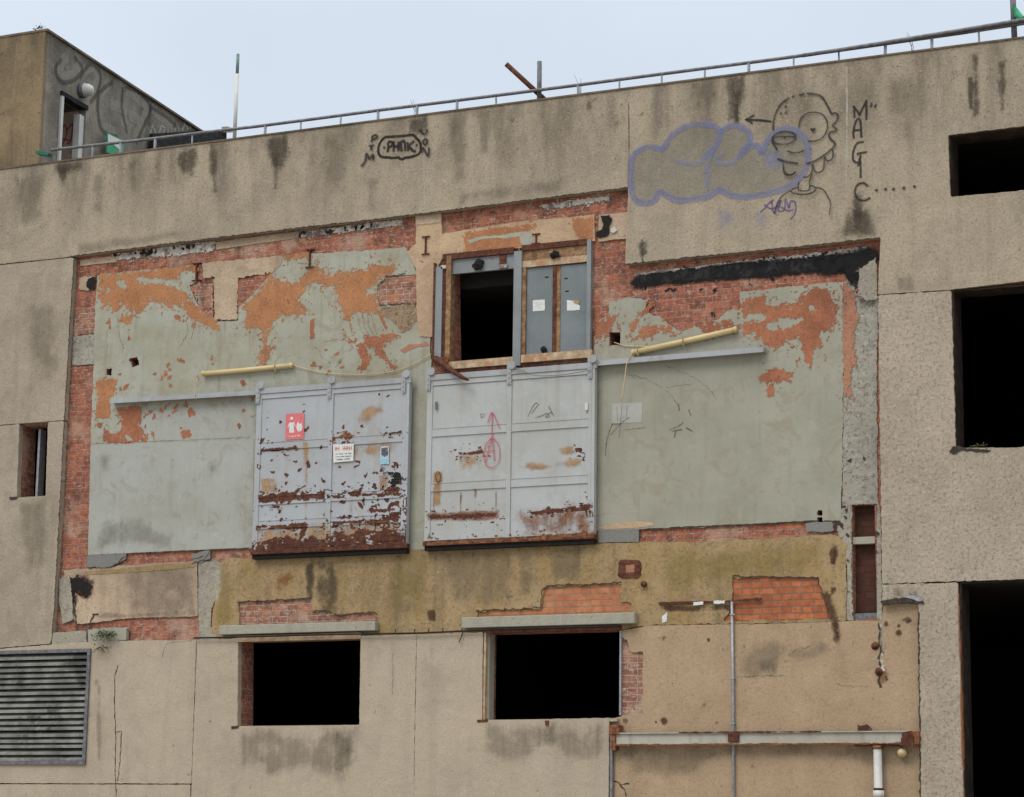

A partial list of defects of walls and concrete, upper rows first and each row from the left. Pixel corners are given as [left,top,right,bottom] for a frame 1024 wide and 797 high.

leakage [968,54,978,115]
leakage [178,149,196,171]
peeling [92,246,428,374]
peeling [697,258,878,402]
peeling [90,373,195,445]
corrosion [251,408,408,554]
corrosion [450,443,490,465]
corrosion [425,472,594,545]
corrosion [563,444,585,465]
spalling [52,575,129,644]
leakage [306,565,337,609]
crack [877,623,888,688]